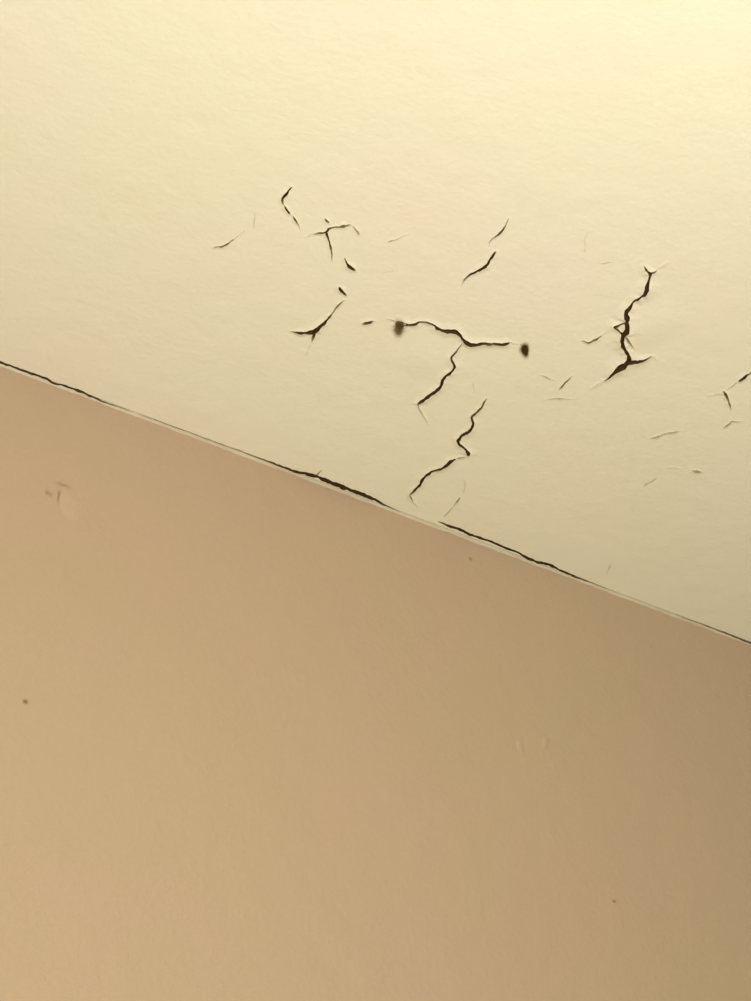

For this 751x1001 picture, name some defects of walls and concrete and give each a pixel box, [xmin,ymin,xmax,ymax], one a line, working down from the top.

crack [211,229,247,250]
crack [539,260,671,391]
crack [0,361,120,408]
crack [242,184,594,584]
crack [703,624,751,644]